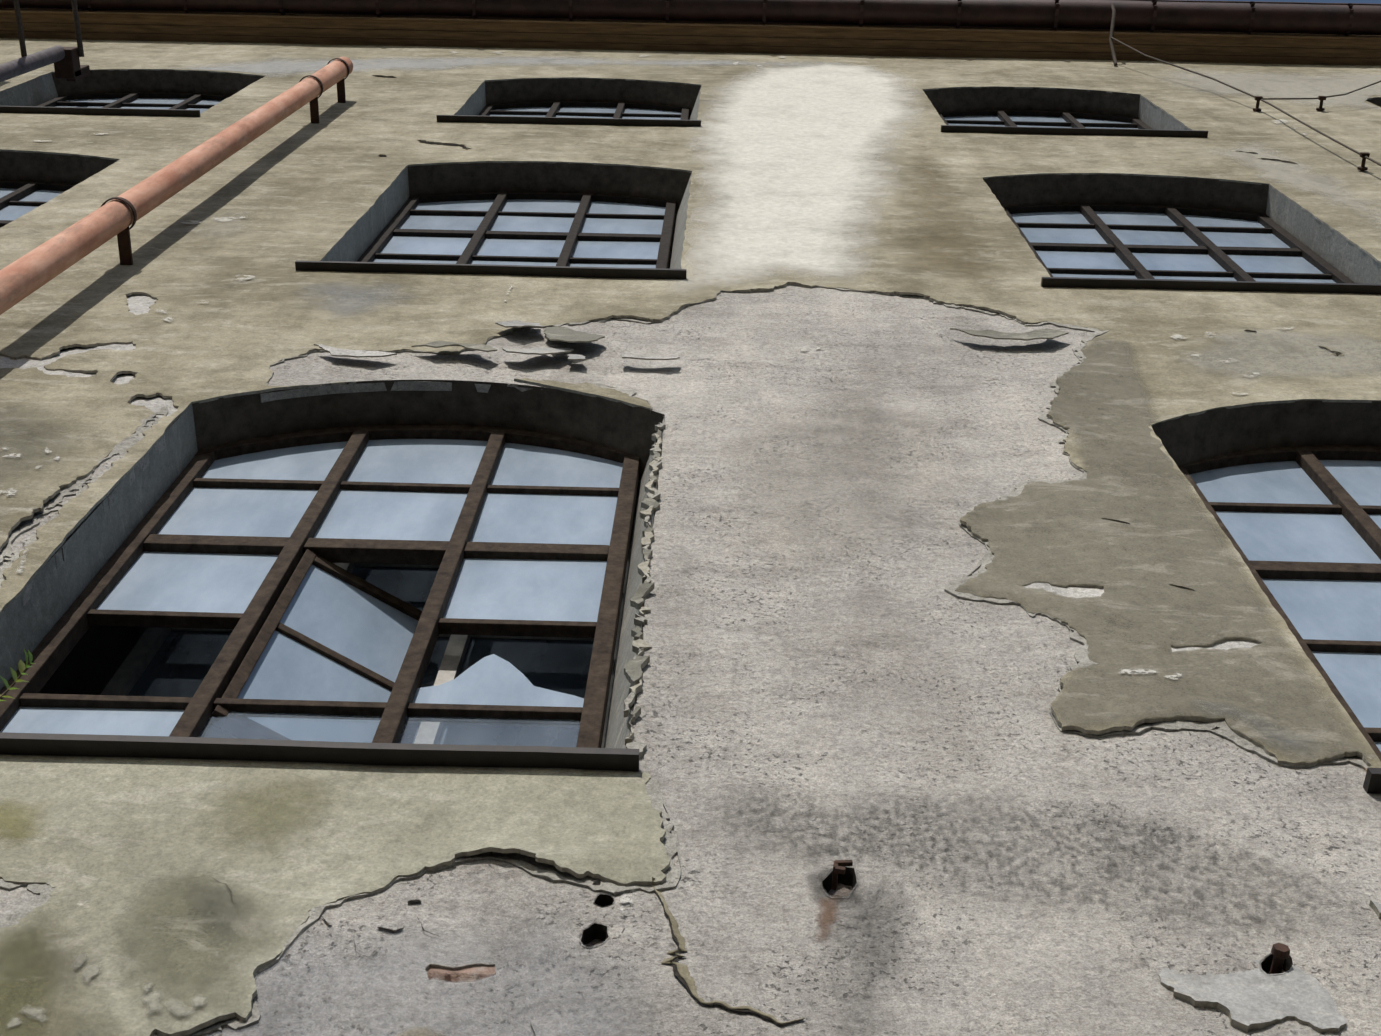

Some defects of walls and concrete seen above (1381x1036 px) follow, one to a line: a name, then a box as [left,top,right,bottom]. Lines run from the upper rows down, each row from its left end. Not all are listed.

leakage [194,61,333,73]
leakage [351,58,915,281]
peeling [126,296,172,321]
peeling [0,343,136,377]
peeling [0,374,179,606]
peeling [185,284,1381,1036]
peeling [0,878,55,928]
peeling [73,953,100,981]
crack [652,877,805,1025]
peeling [143,983,205,1015]
peeling [8,1008,46,1027]